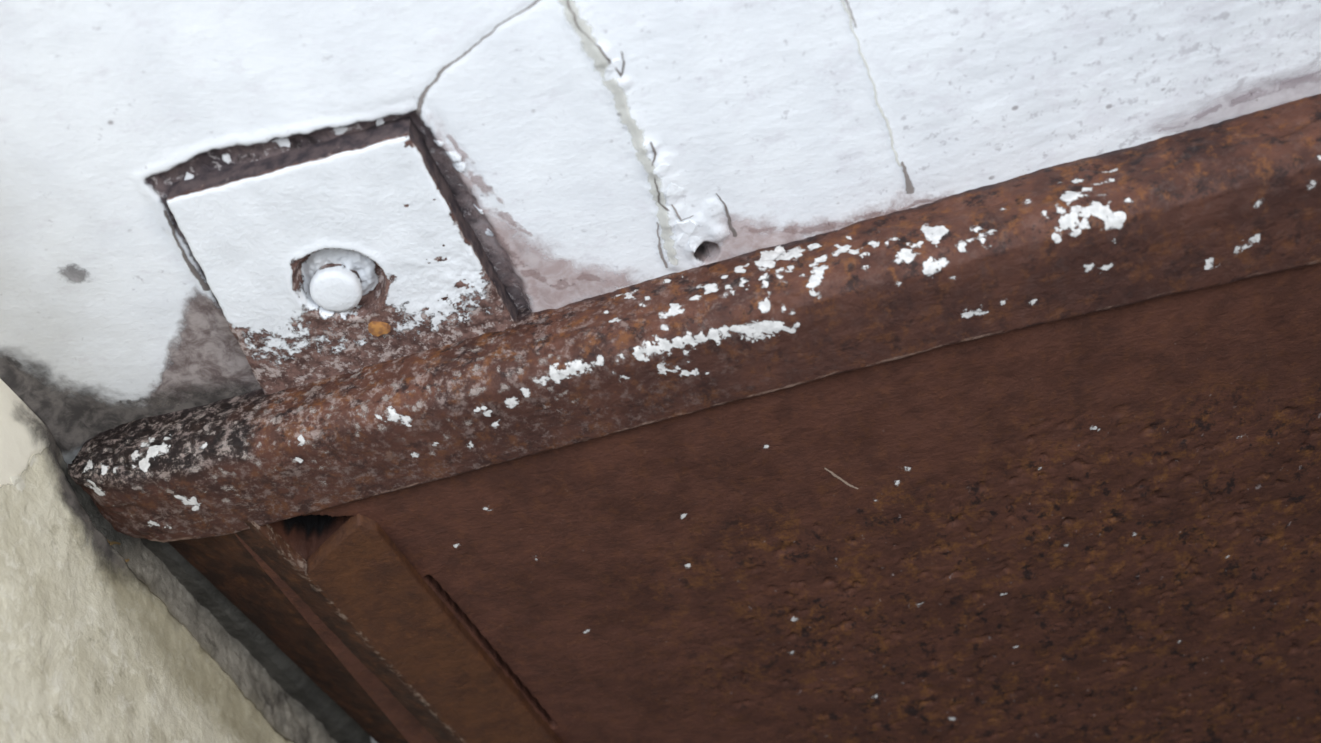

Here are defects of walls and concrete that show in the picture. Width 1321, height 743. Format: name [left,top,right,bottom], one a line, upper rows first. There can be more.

crack [416,0,737,268]
crack [841,0,914,194]
corrosion [1161,68,1321,131]
corrosion [442,146,632,312]
corrosion [705,220,847,265]
corrosion [148,292,262,404]
corrosion [368,321,391,337]
water stain [0,352,253,588]
peeling [0,448,371,743]